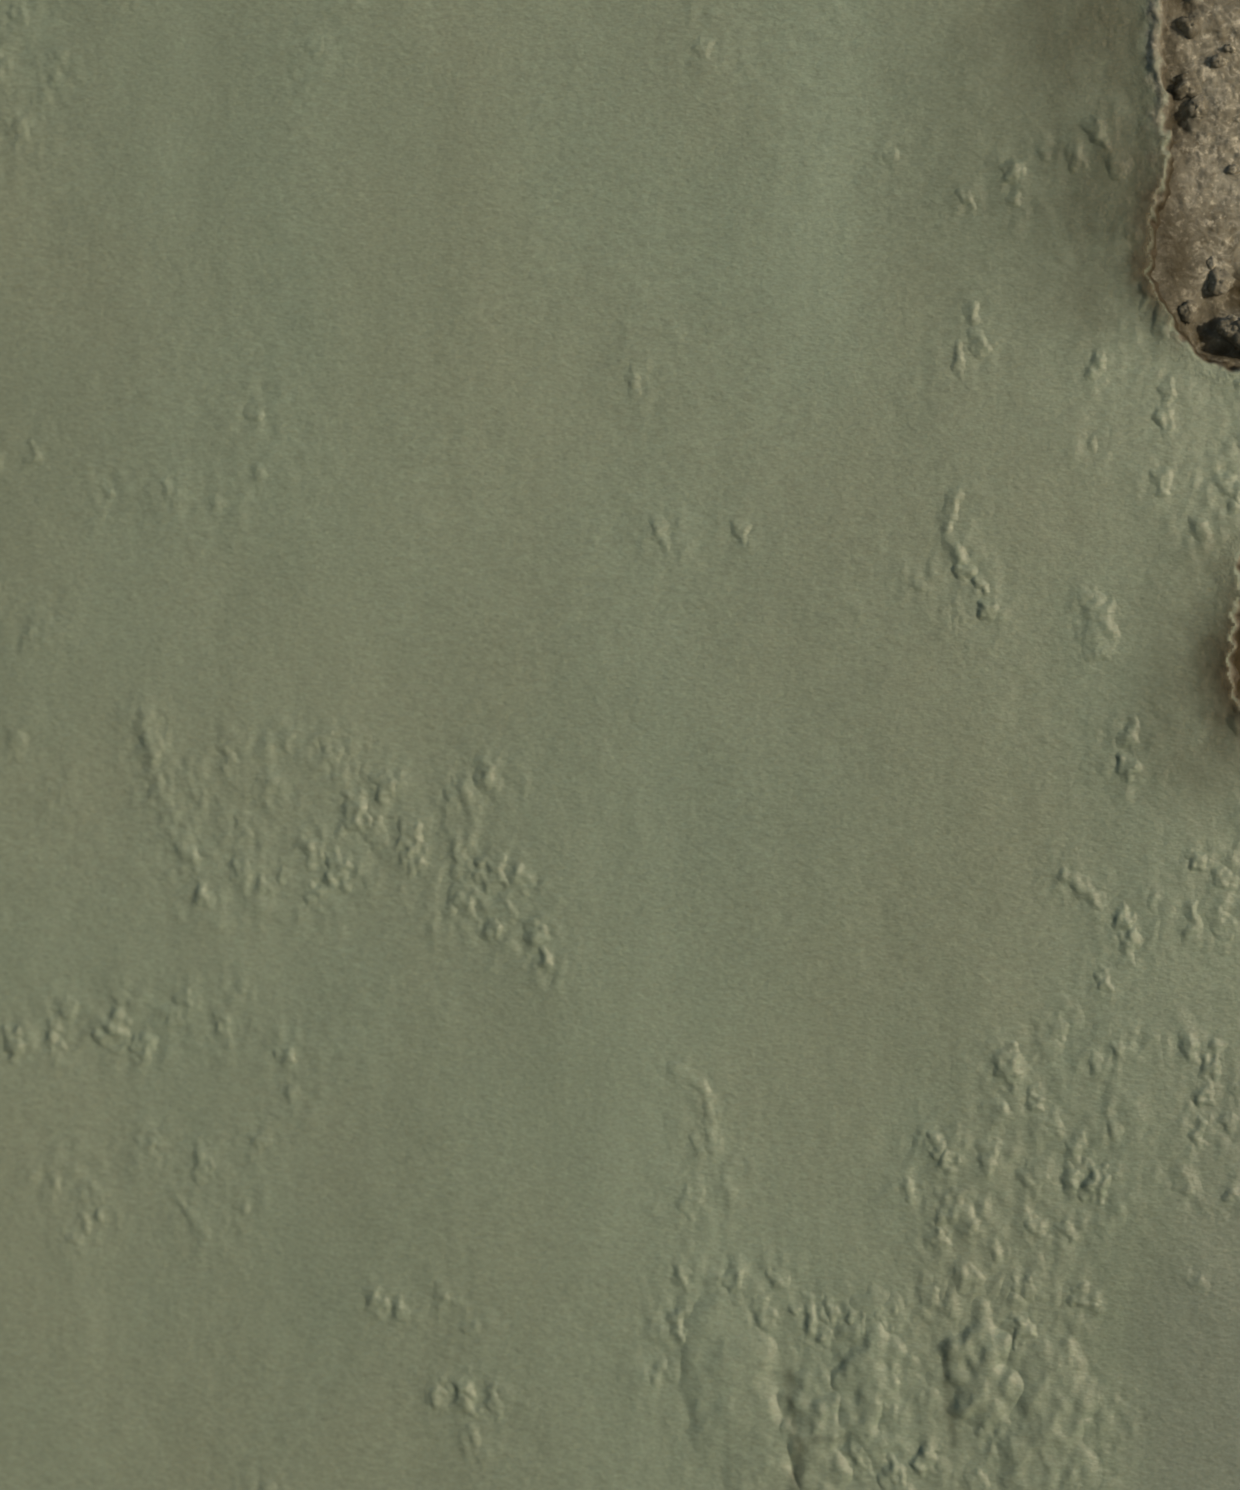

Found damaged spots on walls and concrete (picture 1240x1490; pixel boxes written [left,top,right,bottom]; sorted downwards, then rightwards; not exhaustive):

spalling [1125,0,1240,387]
spalling [1203,527,1240,707]